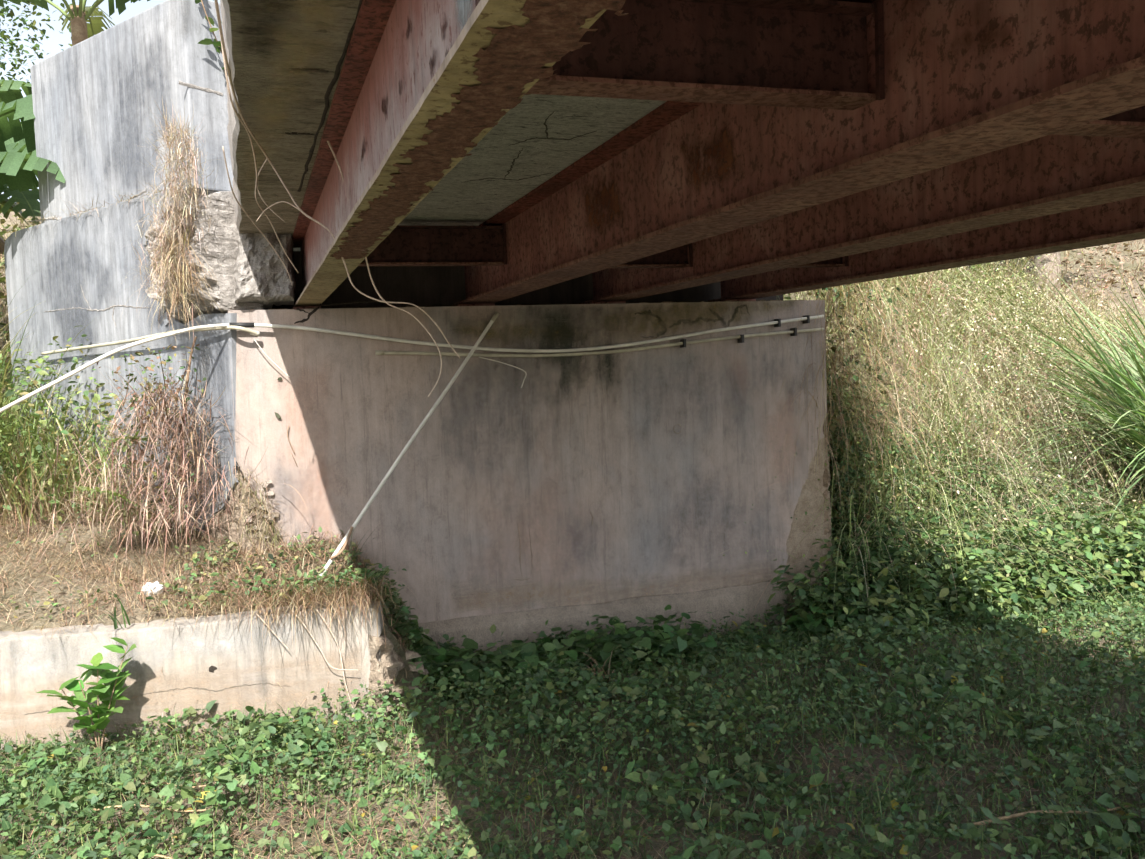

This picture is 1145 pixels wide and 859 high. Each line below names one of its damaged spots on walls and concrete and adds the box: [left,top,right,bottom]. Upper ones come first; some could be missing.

leakage [113,53,167,188]
rust [330,0,628,259]
crack [461,112,597,183]
leakage [41,243,92,343]
spalling [143,191,296,326]
spalling [783,416,833,612]